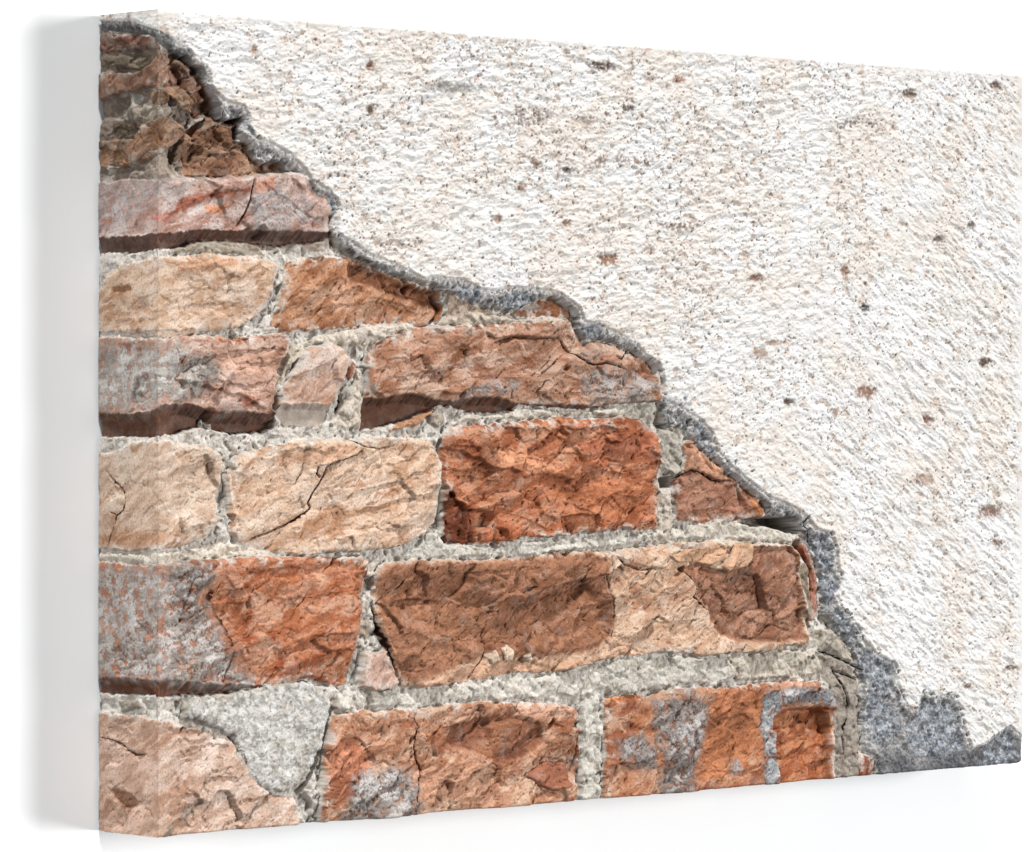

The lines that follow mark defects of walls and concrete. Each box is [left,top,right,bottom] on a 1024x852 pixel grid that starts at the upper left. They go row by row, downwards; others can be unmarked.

flaking render [101,20,1022,774]
crack [107,481,126,547]
crack [246,439,390,542]
crack [818,651,864,759]
spalling [526,761,573,791]